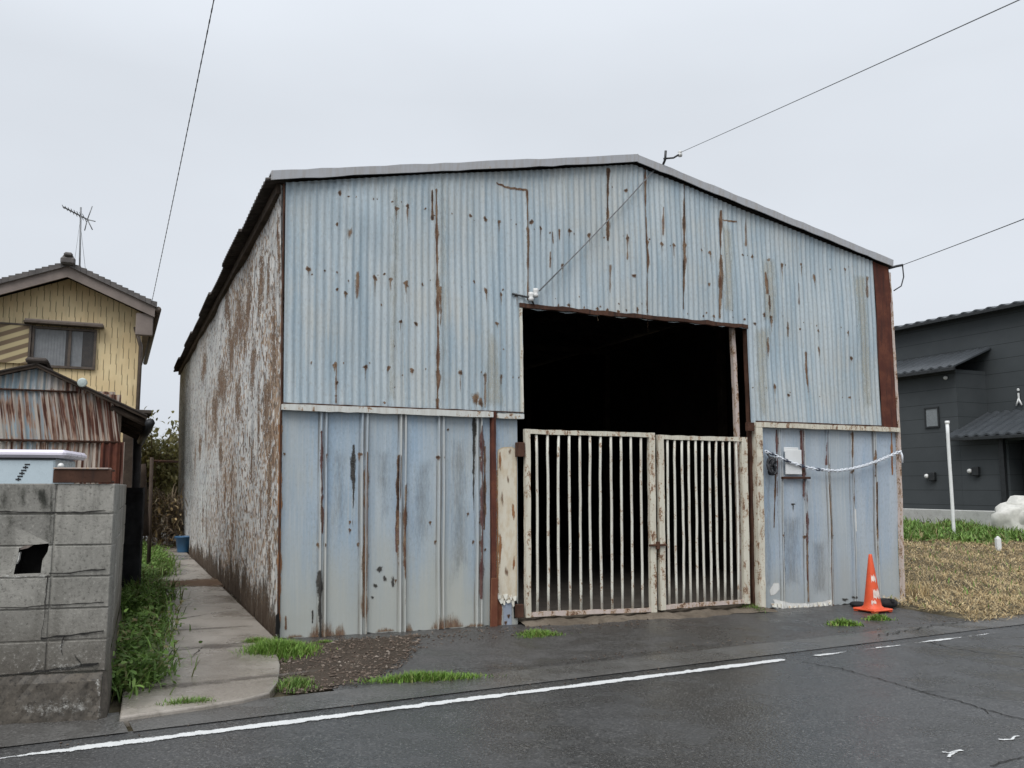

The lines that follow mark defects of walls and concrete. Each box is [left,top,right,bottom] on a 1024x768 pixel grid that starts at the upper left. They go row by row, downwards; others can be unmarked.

rust [402,189,442,409]
rust [496,168,628,300]
rust [555,168,688,317]
rust [701,210,754,318]
peeling [194,206,281,592]
spalling [6,545,49,577]
rust [349,445,369,633]
rust [395,455,407,583]
rust [467,417,515,627]